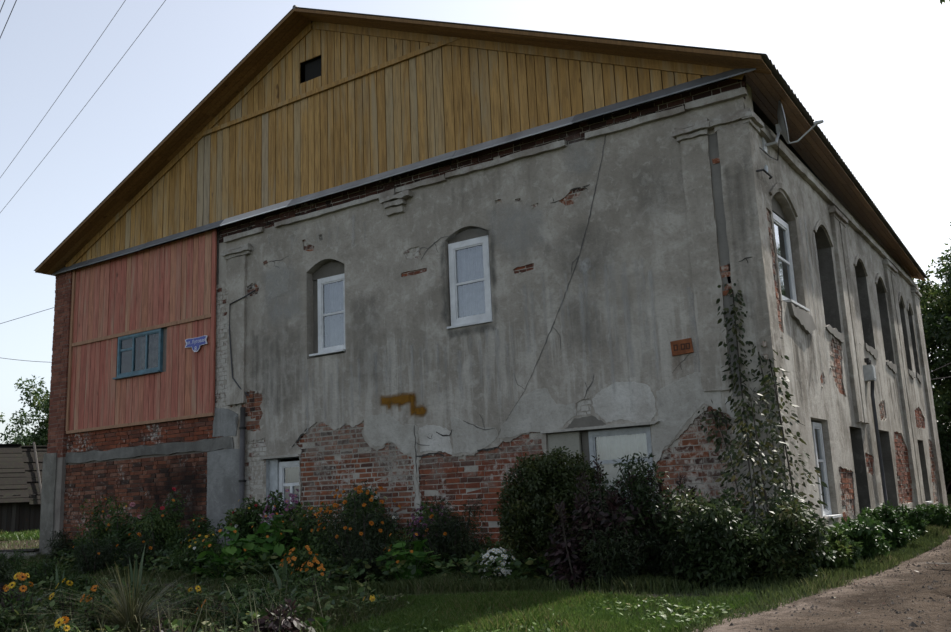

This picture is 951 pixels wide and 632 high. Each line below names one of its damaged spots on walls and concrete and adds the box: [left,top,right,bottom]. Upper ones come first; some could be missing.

spalling [559,187,585,206]
spalling [401,247,427,277]
crack [414,135,606,473]
spalling [514,263,534,274]
spalling [215,281,266,518]
spalling [820,336,845,396]
spalling [295,421,544,554]
spalling [653,406,747,518]
spalling [839,467,855,523]
spalling [865,452,874,476]
spalling [894,432,913,504]
spalling [915,407,938,504]